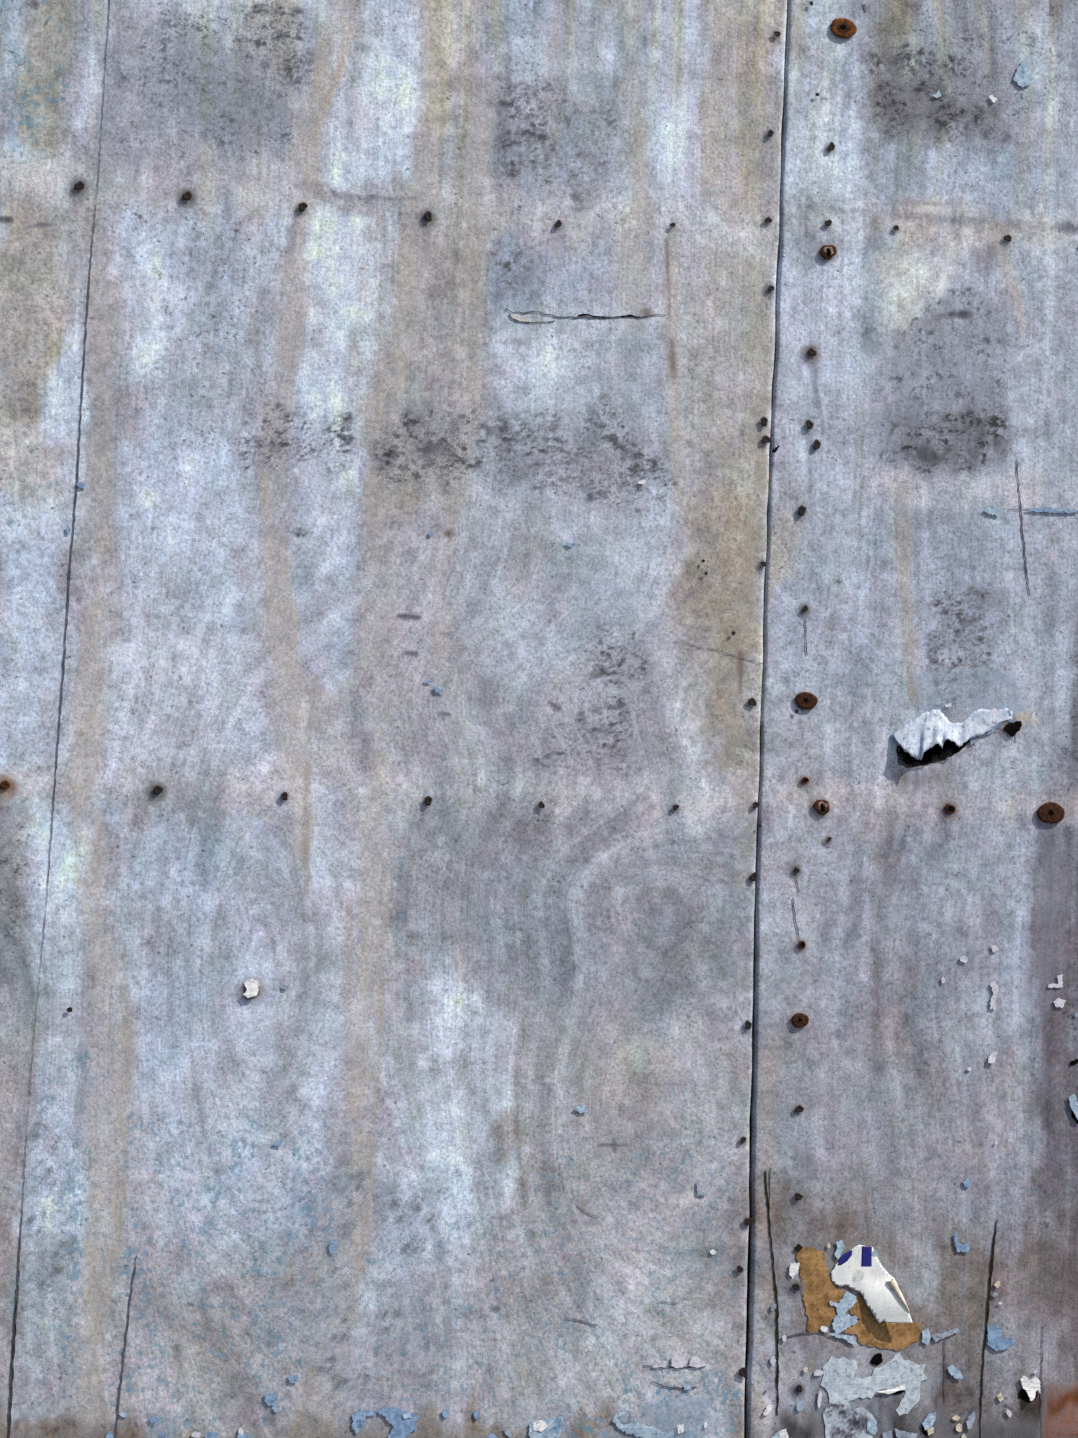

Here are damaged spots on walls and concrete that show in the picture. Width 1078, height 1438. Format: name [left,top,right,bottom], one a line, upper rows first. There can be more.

water stain [865,42,1012,143]
crack [506,308,666,323]
water stain [877,286,1011,474]
peeling [892,703,1036,768]
peeling [789,1262,800,1279]
crack [765,1168,827,1416]
crack [979,1221,997,1438]
peeling [796,1291,976,1438]
crack [940,1340,948,1403]
peeling [351,1407,419,1438]
peeling [612,1411,708,1438]
peeling [772,1429,789,1438]